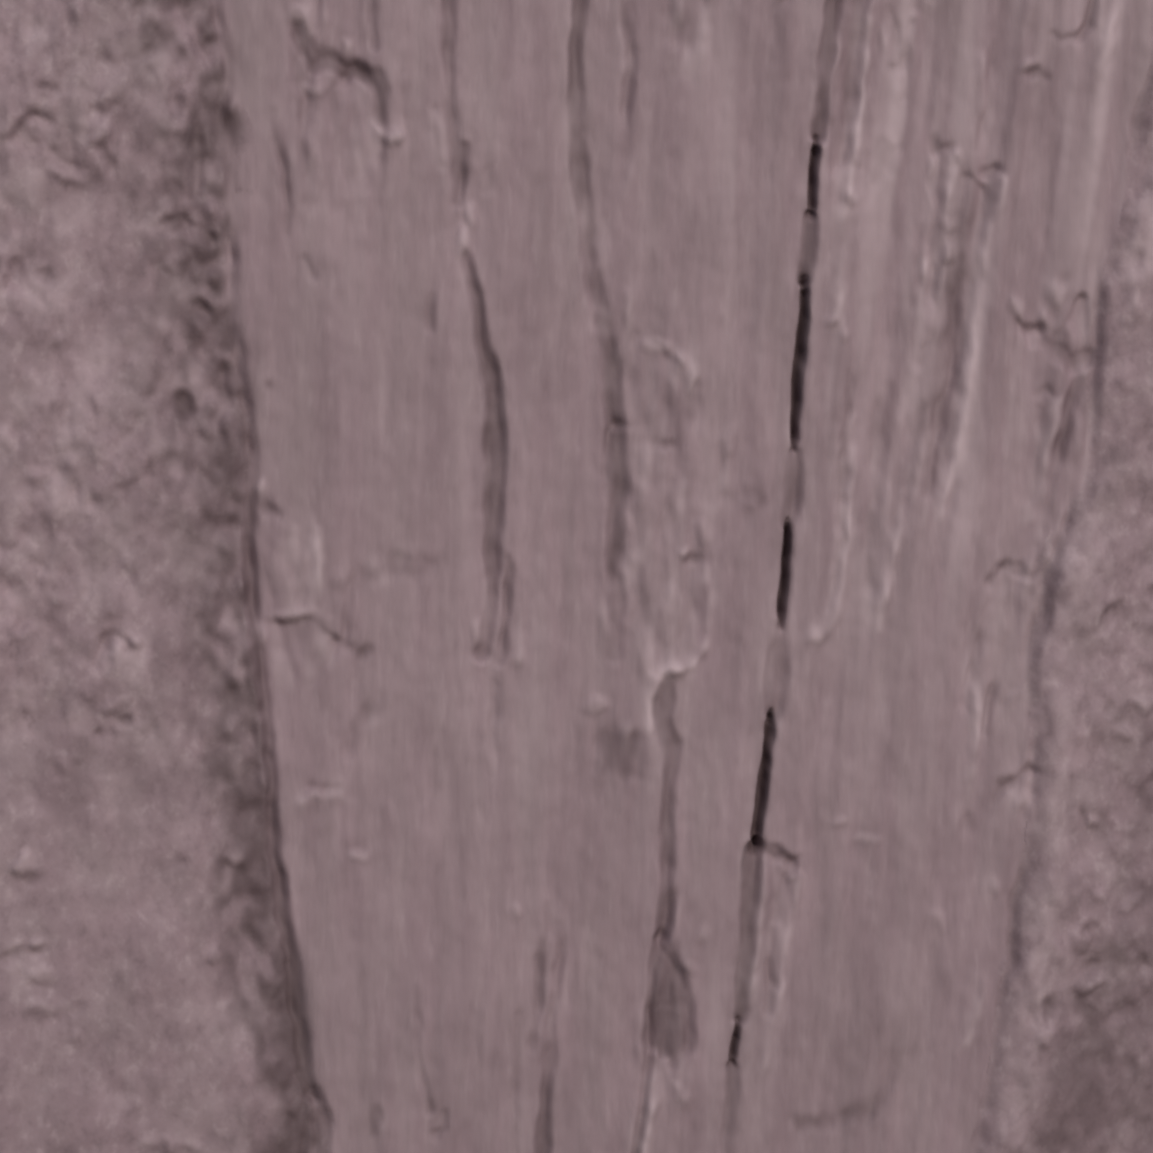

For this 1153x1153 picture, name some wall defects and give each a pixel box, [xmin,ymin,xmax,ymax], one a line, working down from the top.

crack [720,0,840,1153]